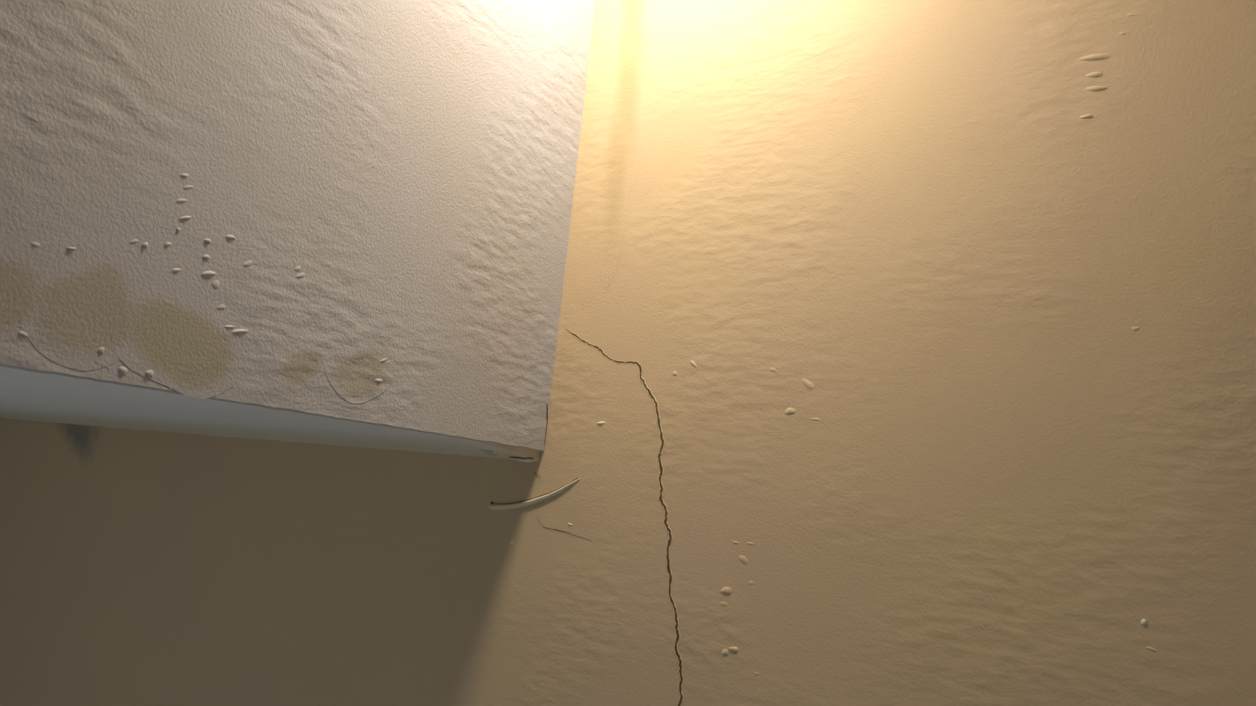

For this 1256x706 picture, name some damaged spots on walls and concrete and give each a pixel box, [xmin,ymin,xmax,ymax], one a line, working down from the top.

damp [0,250,245,399]
damp [276,342,394,404]
crack [566,328,684,706]